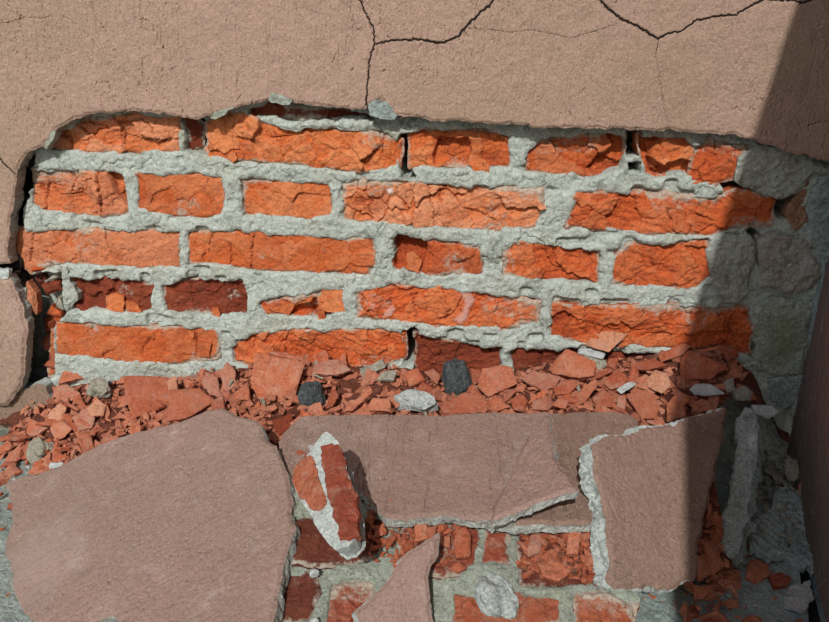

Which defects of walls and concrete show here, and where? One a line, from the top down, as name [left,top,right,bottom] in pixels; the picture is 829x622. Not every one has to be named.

crack [359,0,812,129]
crack [0,254,24,279]
spalling [0,92,829,475]
spalling [449,526,471,573]
spalling [527,531,581,584]
spalling [697,484,814,622]